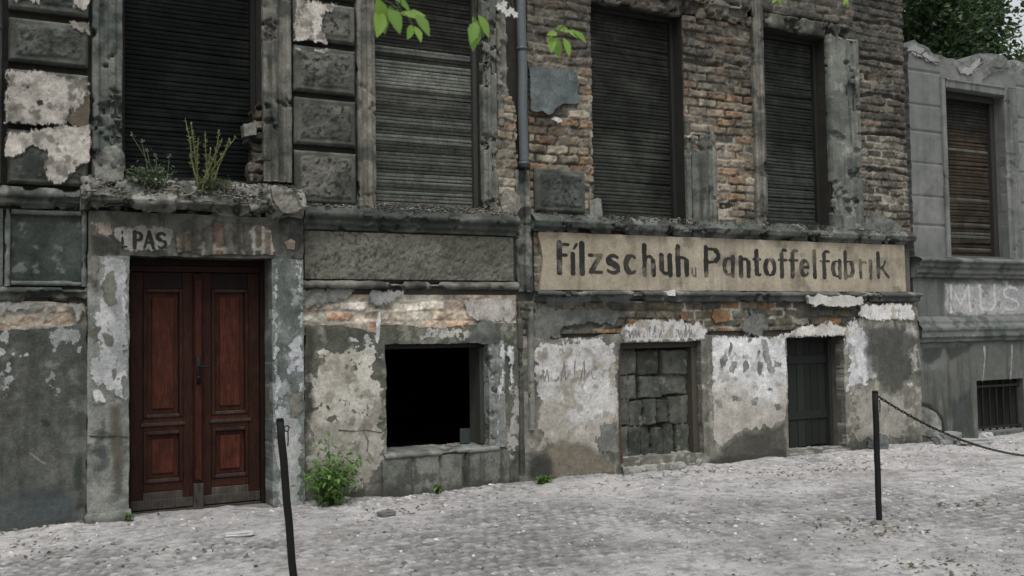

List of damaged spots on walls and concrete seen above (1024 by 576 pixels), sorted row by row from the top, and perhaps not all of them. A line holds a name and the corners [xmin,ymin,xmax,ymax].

flaking render [293,0,335,54]
flaking render [958,58,980,76]
flaking render [3,69,126,184]
peeling [0,219,994,507]